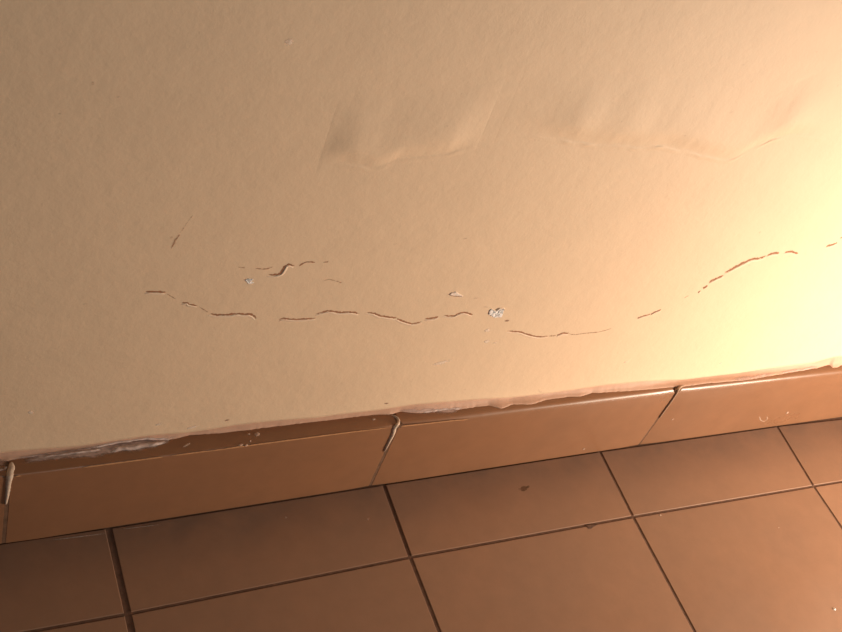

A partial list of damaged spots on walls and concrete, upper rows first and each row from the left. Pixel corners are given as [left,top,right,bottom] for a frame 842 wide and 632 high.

crack [242,262,341,283]
crack [685,251,798,298]
crack [145,291,256,320]
crack [279,310,472,326]
flaking render [488,308,509,321]
crack [506,330,605,339]
peeling [0,356,842,461]